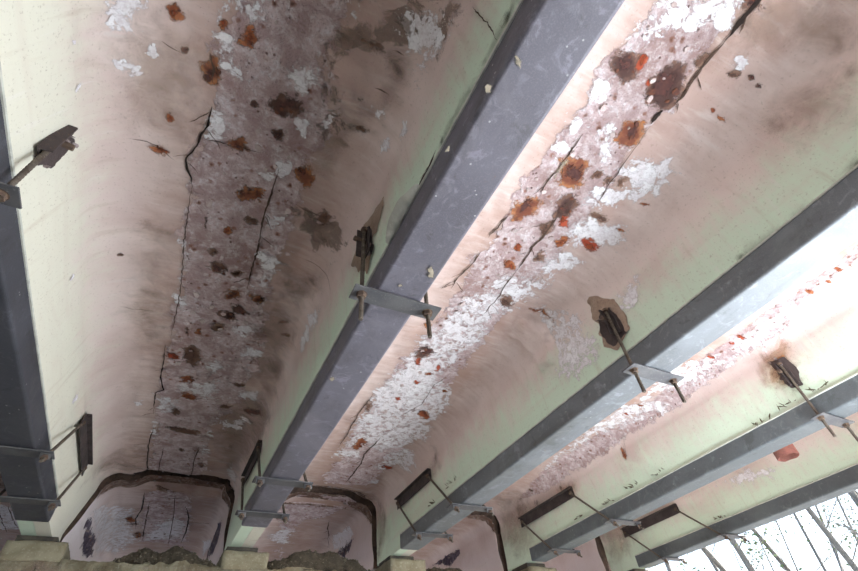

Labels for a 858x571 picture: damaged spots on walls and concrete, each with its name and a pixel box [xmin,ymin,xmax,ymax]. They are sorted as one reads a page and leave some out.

crack [134,107,259,471]
spalling [97,0,352,546]
water stain [265,207,347,251]
water stain [325,0,460,90]
water stain [331,74,682,484]
spalling [272,0,745,560]
crack [484,200,571,318]
corrosion [511,156,630,247]
corrosion [608,50,649,85]
corrosion [644,52,710,111]
crack [598,0,761,203]
spalling [517,246,858,502]